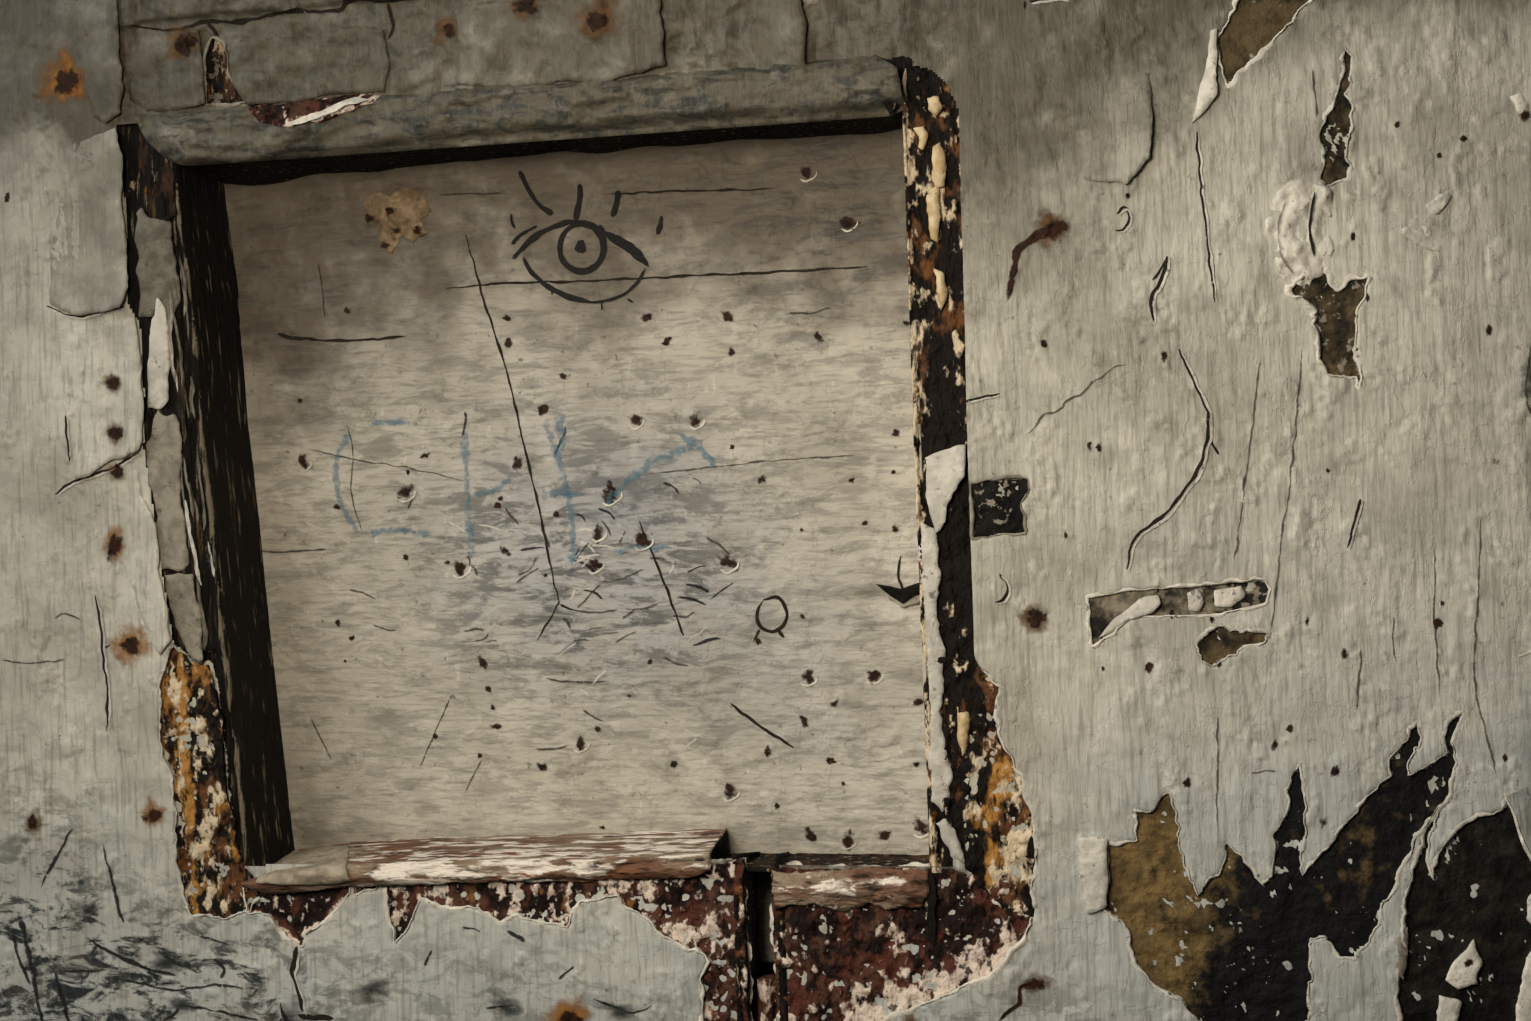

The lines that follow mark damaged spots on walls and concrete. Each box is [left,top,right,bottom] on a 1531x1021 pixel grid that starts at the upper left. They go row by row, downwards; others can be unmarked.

rust [42,50,85,102]
peeling [1192,0,1313,123]
rust [1006,214,1068,300]
peeling [1265,45,1374,391]
rust [111,629,148,661]
peeling [913,445,1030,863]
peeling [1085,576,1272,666]
rust [142,645,754,1021]
rust [769,657,1040,1021]
peeling [1078,709,1531,1021]
rust [999,977,1049,1021]